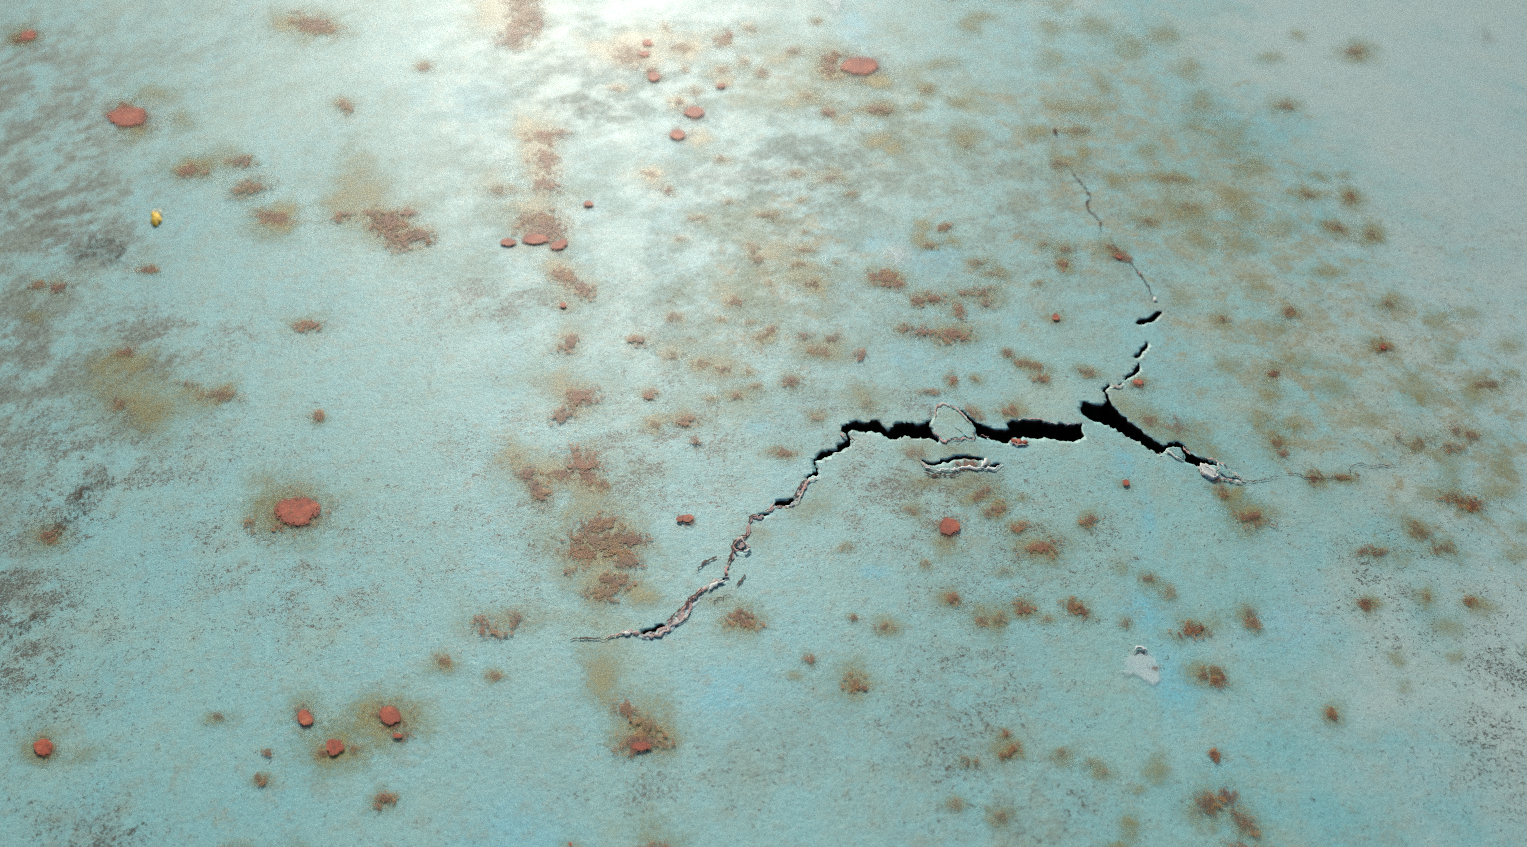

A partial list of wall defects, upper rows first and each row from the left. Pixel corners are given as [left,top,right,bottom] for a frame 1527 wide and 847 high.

rust [480,0,549,52]
rust [322,155,441,253]
rust [500,116,597,300]
crack [570,128,1403,640]
rust [506,376,656,605]
peeling [1124,646,1161,684]
rust [310,694,422,770]
rust [1205,747,1223,764]
rust [1191,782,1260,847]